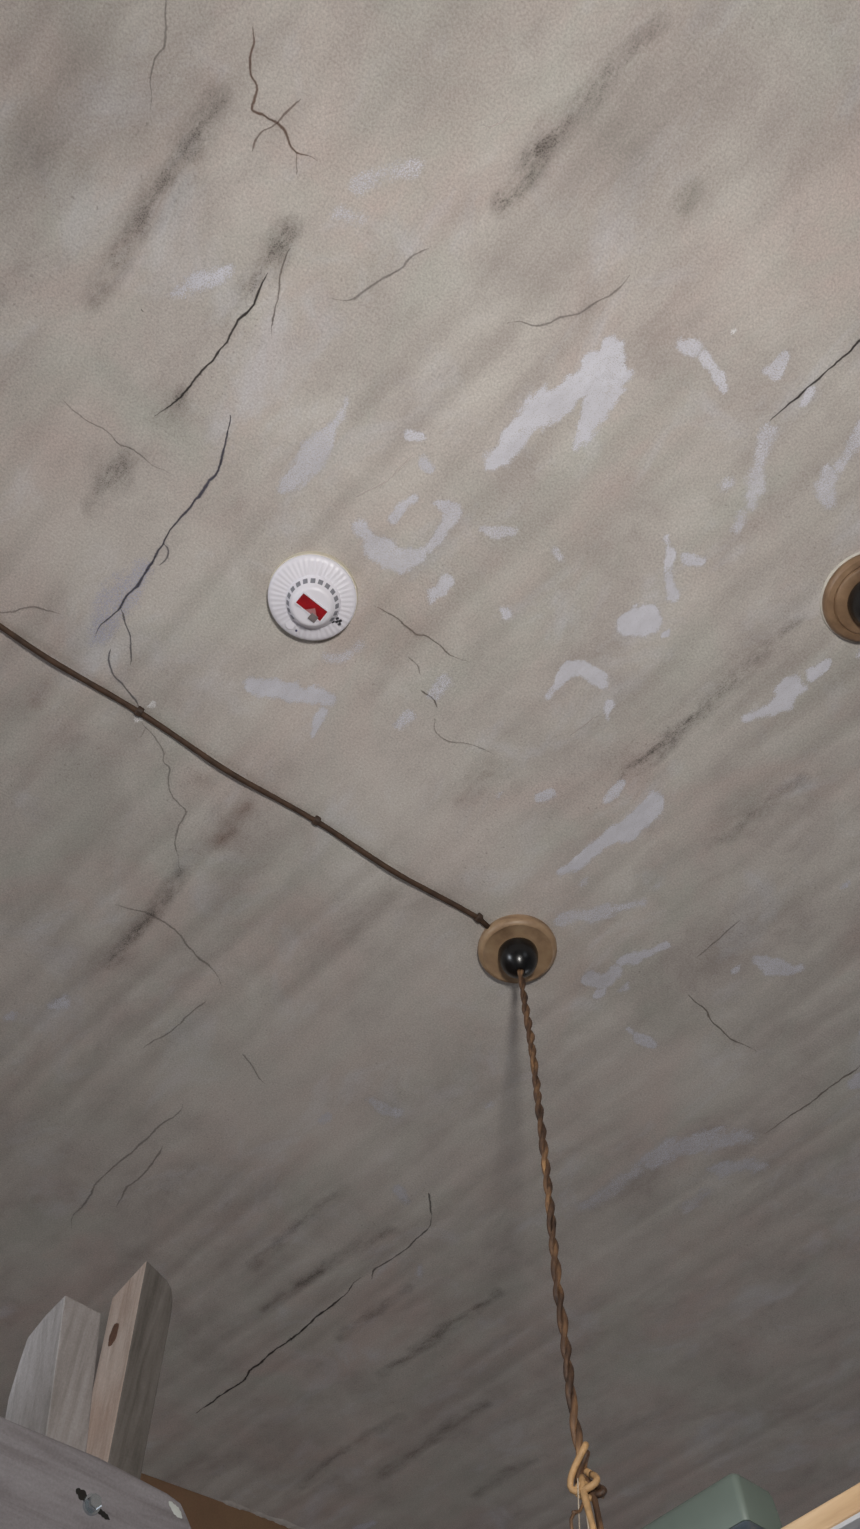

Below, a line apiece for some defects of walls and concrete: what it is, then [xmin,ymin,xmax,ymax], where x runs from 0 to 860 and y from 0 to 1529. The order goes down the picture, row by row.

crack [249,26,313,158]
crack [155,273,268,416]
peeling [480,333,636,472]
crack [772,339,860,419]
crack [96,415,231,704]
peeling [351,494,464,575]
peeling [426,574,455,605]
peeling [740,658,832,723]
peeling [555,789,666,878]
crack [198,1193,432,1412]